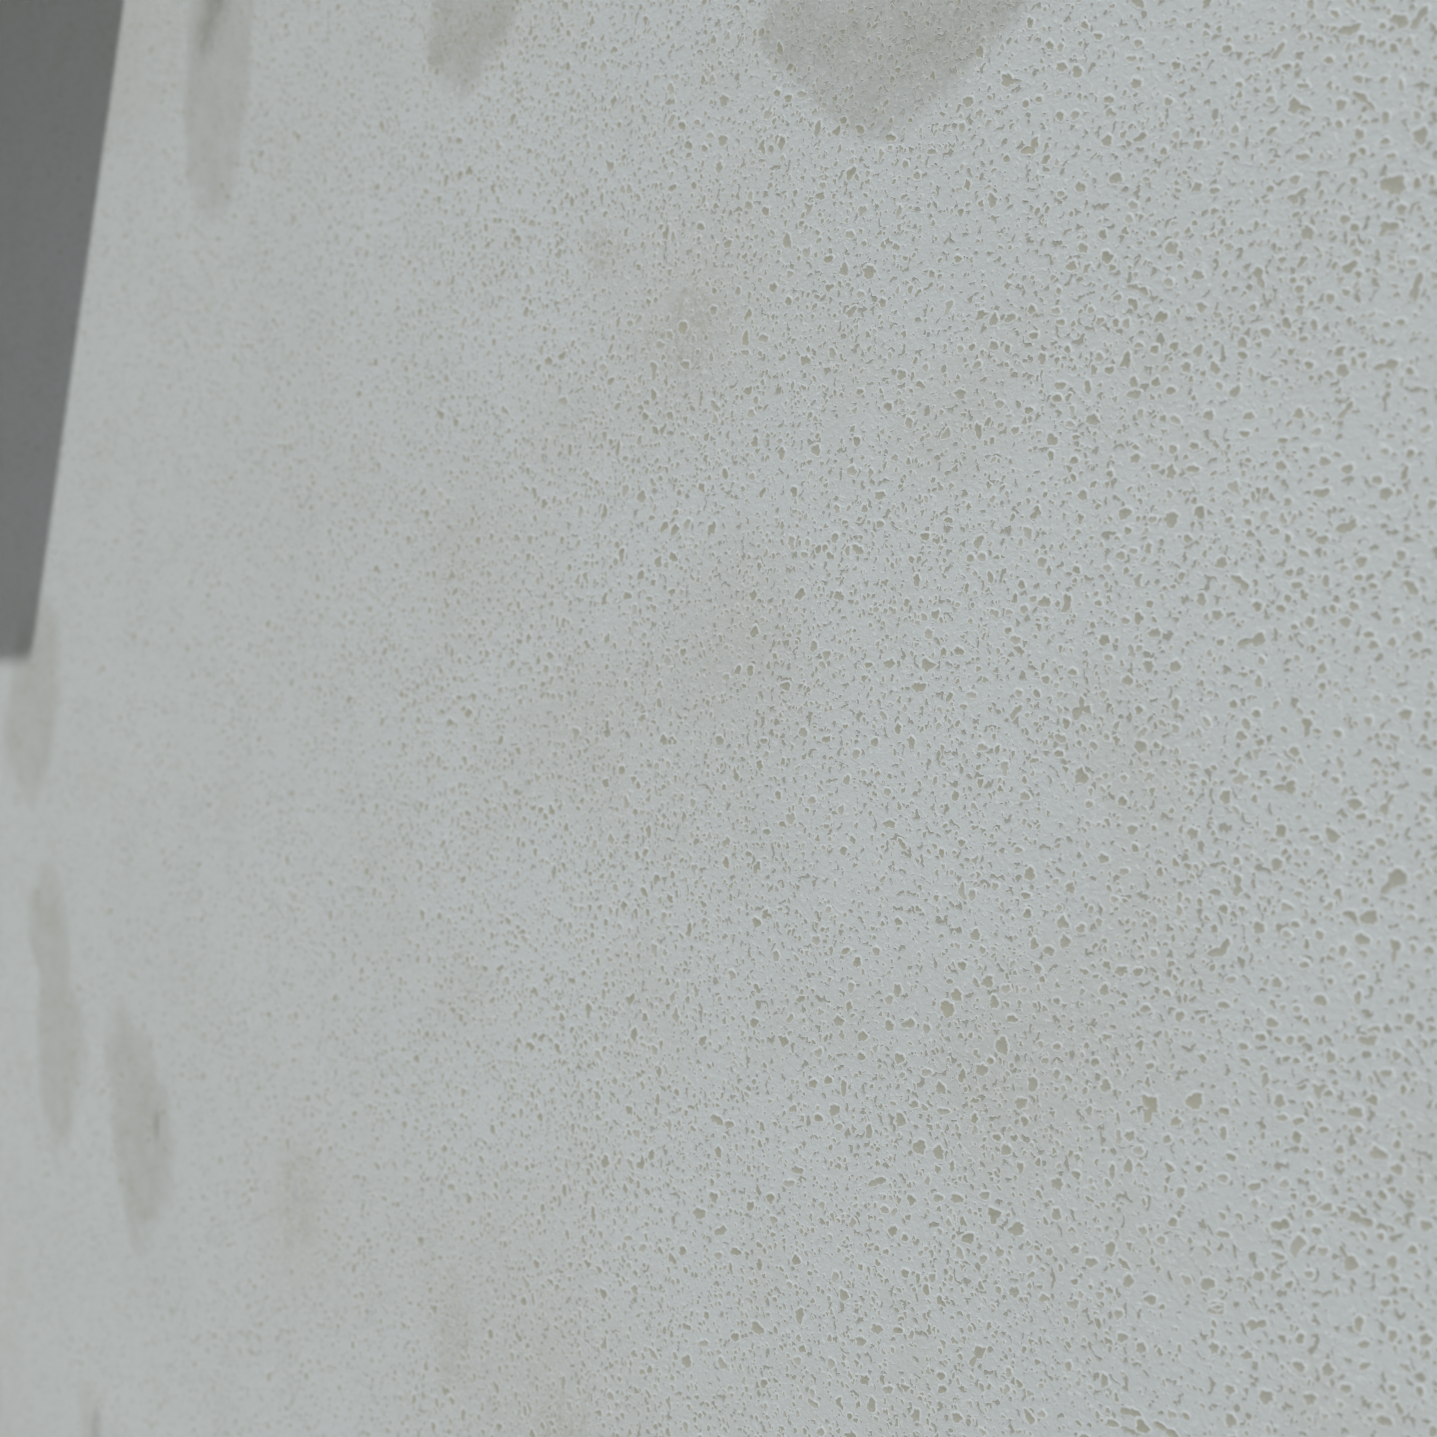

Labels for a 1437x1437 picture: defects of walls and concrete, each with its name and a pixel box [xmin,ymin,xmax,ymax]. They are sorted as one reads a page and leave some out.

water stain [181,0,257,236]
water stain [422,0,525,109]
water stain [756,0,1038,145]